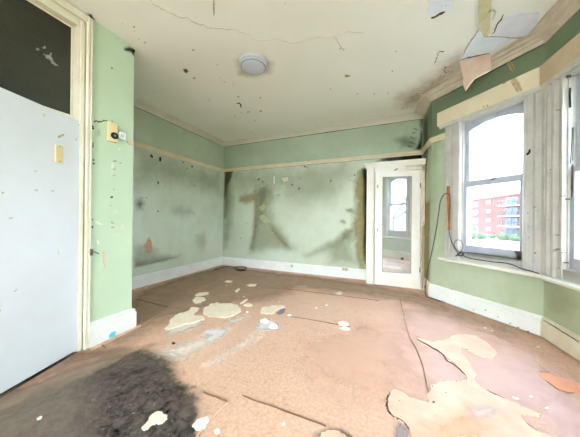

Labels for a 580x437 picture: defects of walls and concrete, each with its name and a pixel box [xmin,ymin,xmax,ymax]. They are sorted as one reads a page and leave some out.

crack [150,0,364,49]
peeling [426,0,455,19]
peeling [460,12,539,60]
damp [380,119,428,177]
damp [355,168,367,265]